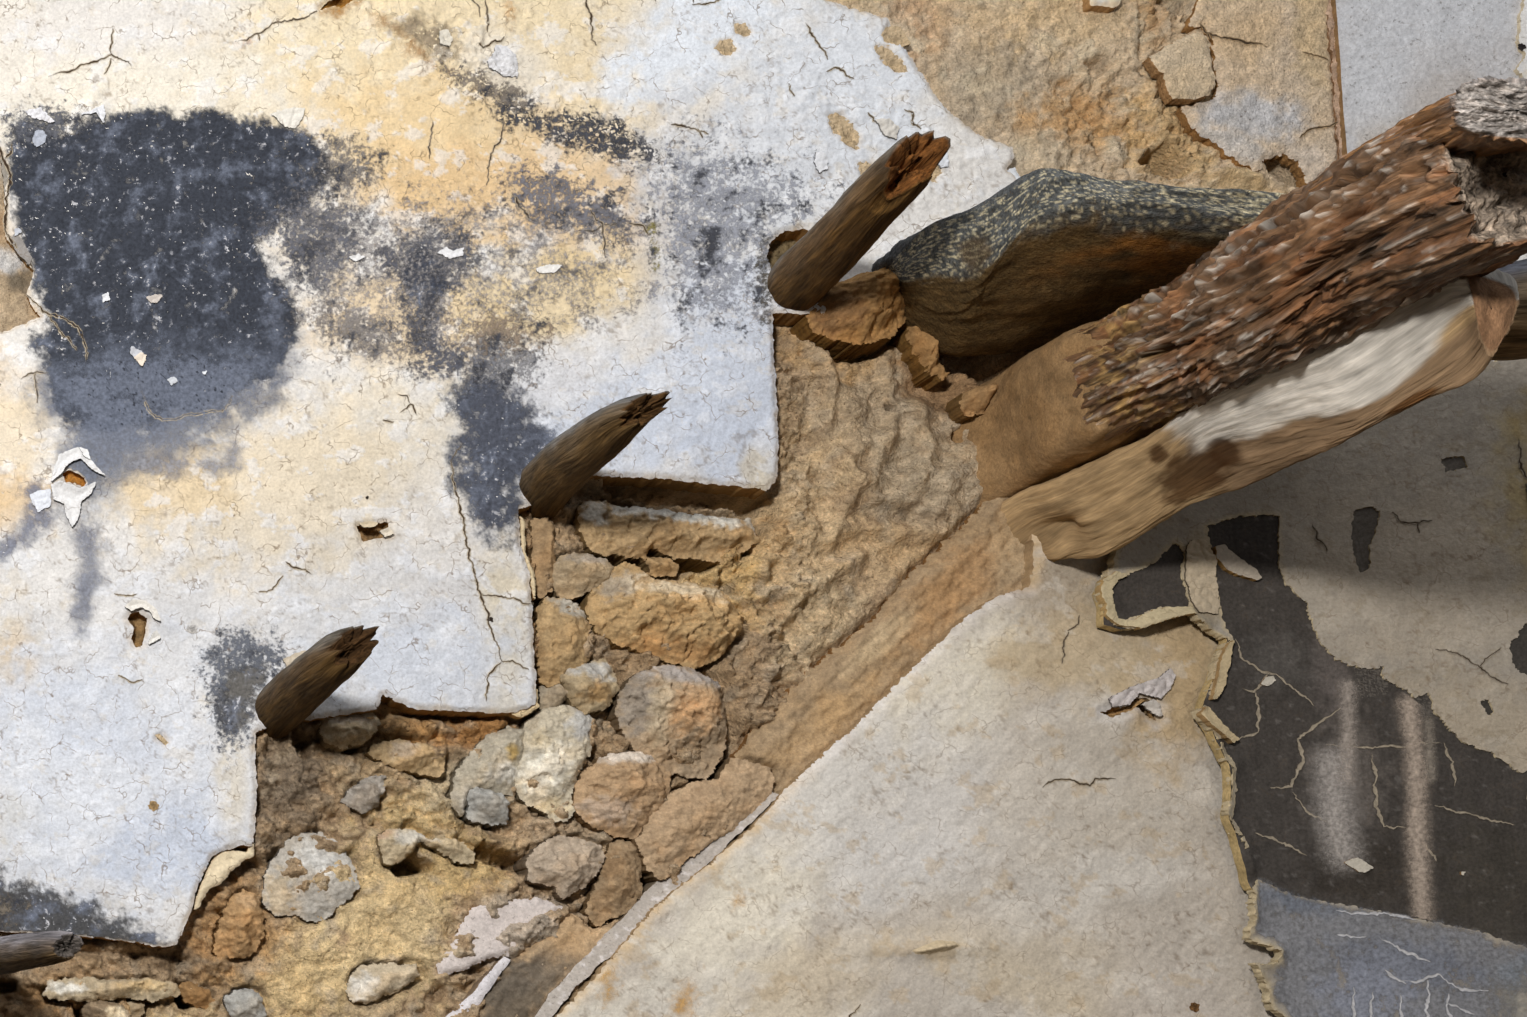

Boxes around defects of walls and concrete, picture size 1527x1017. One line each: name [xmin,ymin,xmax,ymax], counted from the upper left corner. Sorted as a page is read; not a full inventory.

flaking render [826,0,1342,194]
flaking render [0,155,39,332]
water stain [1,18,823,547]
water stain [0,485,52,558]
water stain [71,528,102,632]
water stain [193,628,286,753]
crack [451,446,534,701]
flaking render [0,324,1035,1017]
peeling [1092,507,1527,948]
crack [1436,648,1508,684]
crack [1518,441,1527,479]
water stain [0,867,157,944]